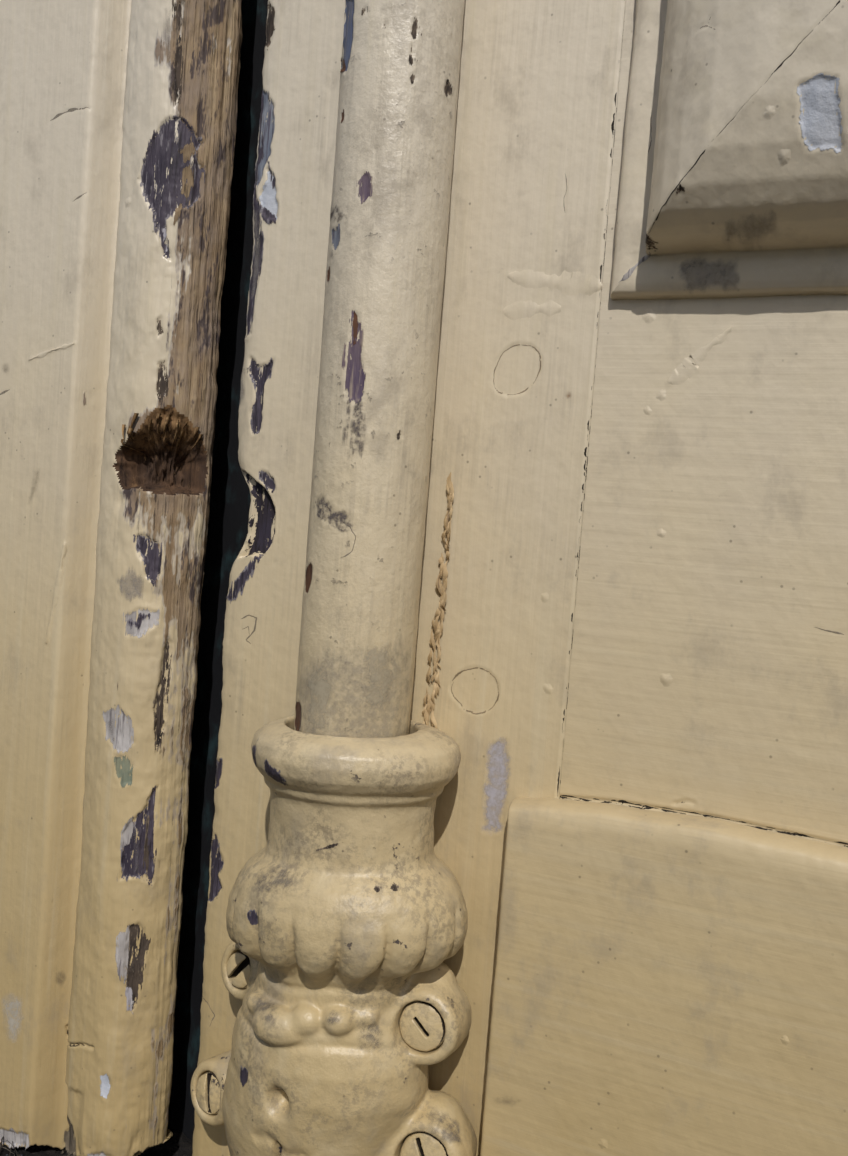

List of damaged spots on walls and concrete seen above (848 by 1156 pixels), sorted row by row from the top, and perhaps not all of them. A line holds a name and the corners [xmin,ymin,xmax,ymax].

peeling [797,73,843,153]
peeling [140,115,207,259]
peeling [244,90,278,341]
peeling [342,310,366,453]
peeling [259,470,275,493]
peeling [120,533,162,638]
peeling [226,553,265,604]
peeling [120,785,158,886]
peeling [115,923,151,1011]